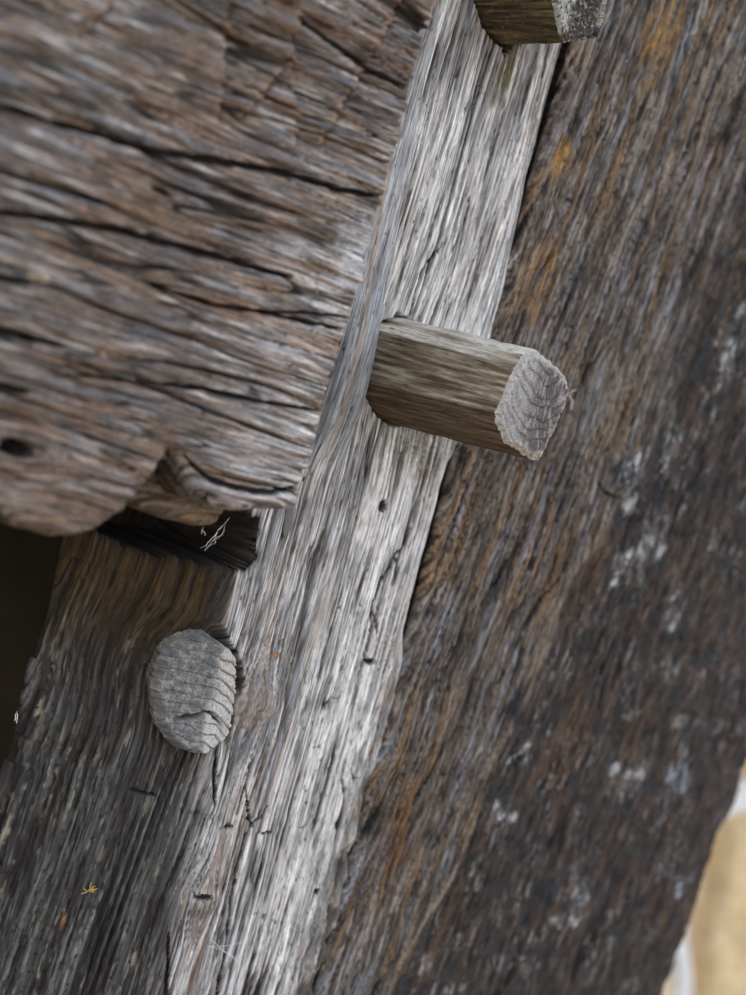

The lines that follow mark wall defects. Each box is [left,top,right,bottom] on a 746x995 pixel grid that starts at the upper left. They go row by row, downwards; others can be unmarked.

crack [298,18,406,89]
crack [0,105,375,198]
crack [0,209,289,279]
crack [409,199,469,315]
crack [0,275,42,286]
crack [149,284,346,329]
crack [0,327,62,346]
crack [0,383,26,394]
crack [64,373,317,411]
crack [183,454,294,494]
crack [163,932,171,995]